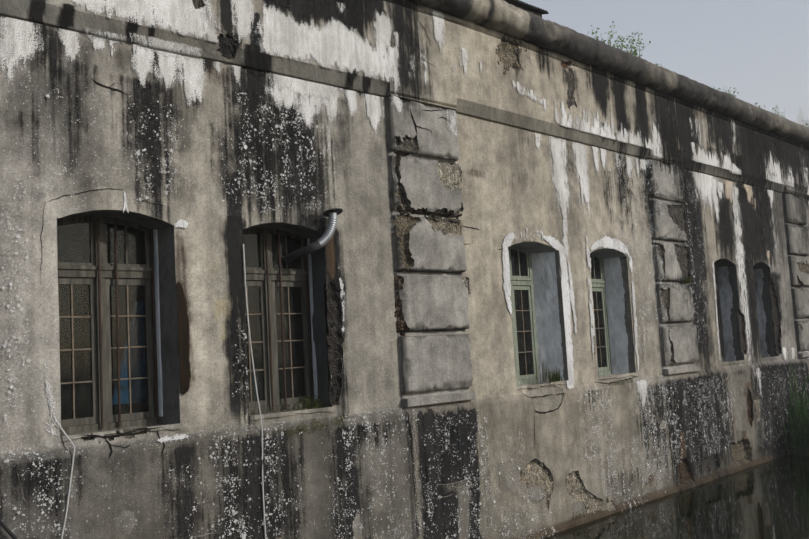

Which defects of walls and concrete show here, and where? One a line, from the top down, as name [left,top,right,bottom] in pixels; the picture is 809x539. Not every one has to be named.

leakage [430,10,445,50]
spalling [495,35,522,73]
crack [91,78,127,95]
spalling [560,61,577,109]
crack [40,188,164,278]
spalling [389,135,464,338]
leakage [0,0,433,539]
leakage [512,46,809,489]
crack [520,389,565,437]
crack [79,427,165,458]
leakage [411,407,546,539]
spalling [566,472,617,514]